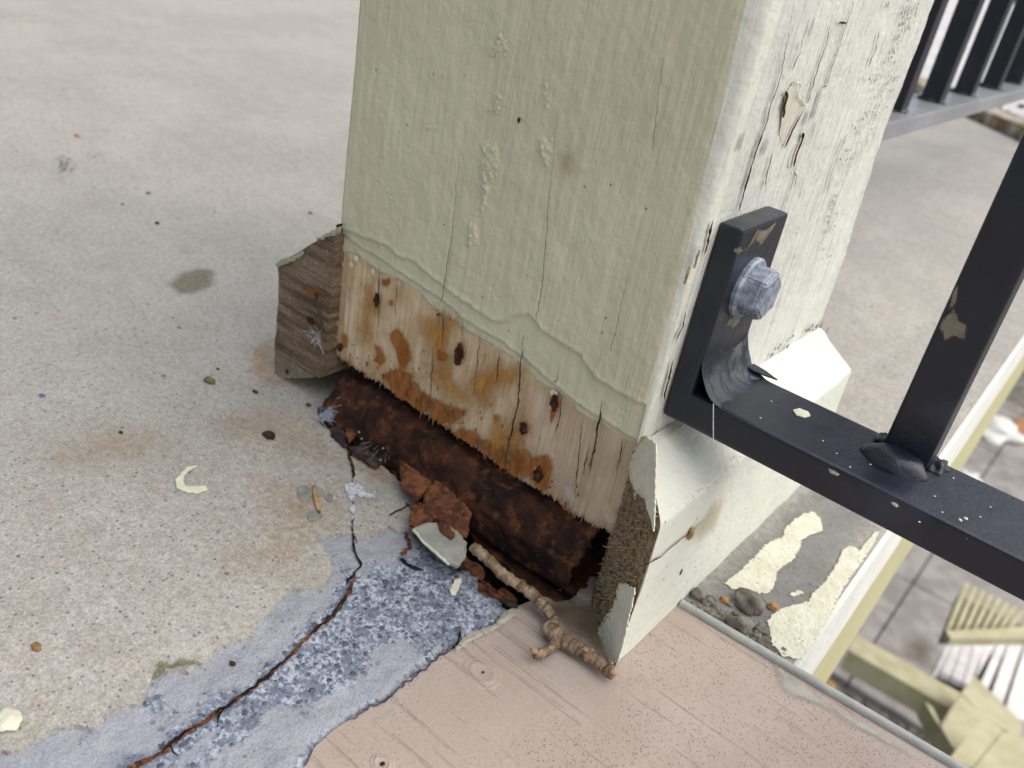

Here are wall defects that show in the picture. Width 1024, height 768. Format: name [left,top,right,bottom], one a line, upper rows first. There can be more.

peeling [779,82,808,168]
damp [172,269,212,293]
crack [430,115,558,466]
spalling [0,522,507,768]
crack [346,444,363,585]
spalling [344,482,376,520]
rust [330,279,559,492]
rust [399,461,573,602]
rust [549,394,561,423]
crack [555,375,623,506]
peeling [724,511,823,595]
peeling [767,531,879,660]